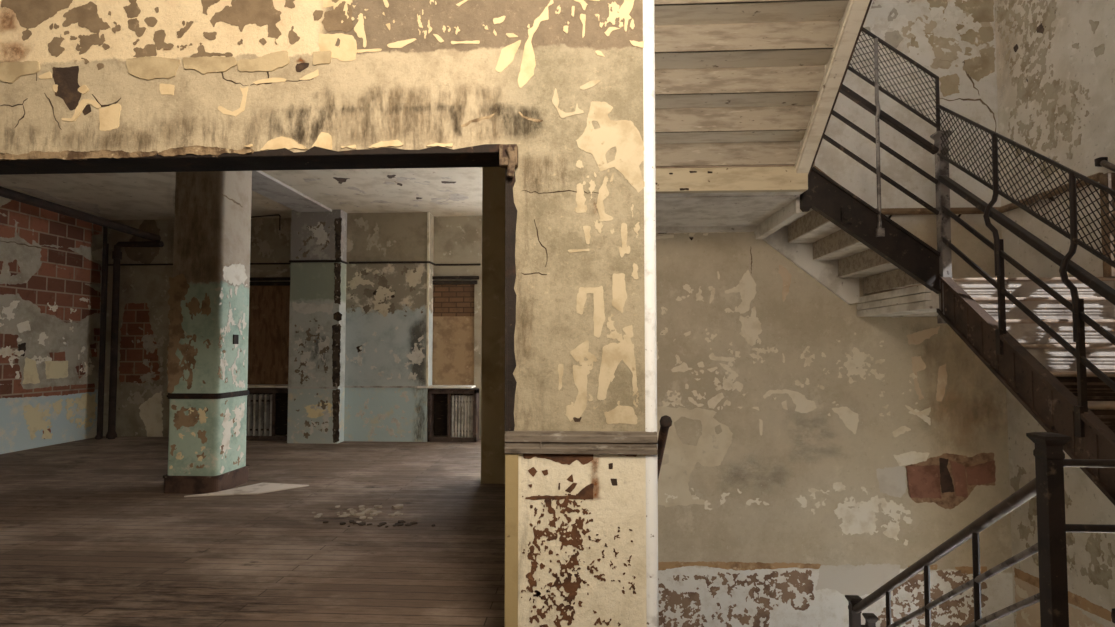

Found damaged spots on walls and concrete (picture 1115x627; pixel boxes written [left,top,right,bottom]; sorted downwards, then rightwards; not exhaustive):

flaking render [0,0,644,131]
crack [940,59,996,132]
peeling [862,0,1090,179]
peeling [383,175,469,207]
spalling [0,187,103,440]
spalling [119,177,425,474]
peeling [657,270,891,510]
peeling [892,326,948,437]
peeling [521,454,636,627]
peeling [658,561,988,627]
spalling [796,451,996,546]
peeling [1066,532,1115,589]